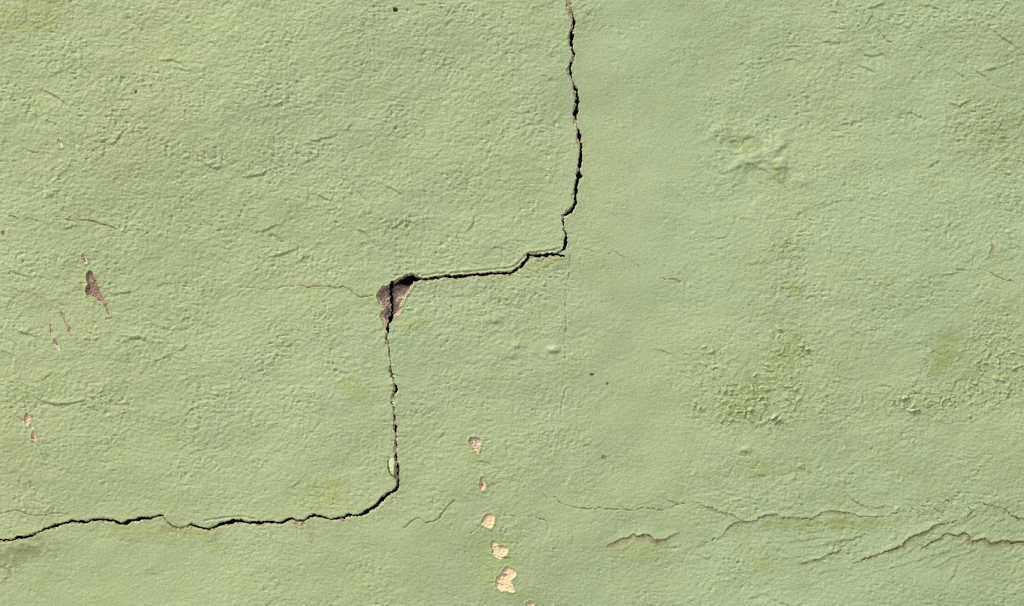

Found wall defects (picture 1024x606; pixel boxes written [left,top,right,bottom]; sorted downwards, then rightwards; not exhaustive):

peeling [81,254,110,316]
crack [0,0,583,543]
spalling [376,273,421,327]
peeling [469,437,482,454]
peeling [481,514,495,528]
peeling [491,541,517,592]